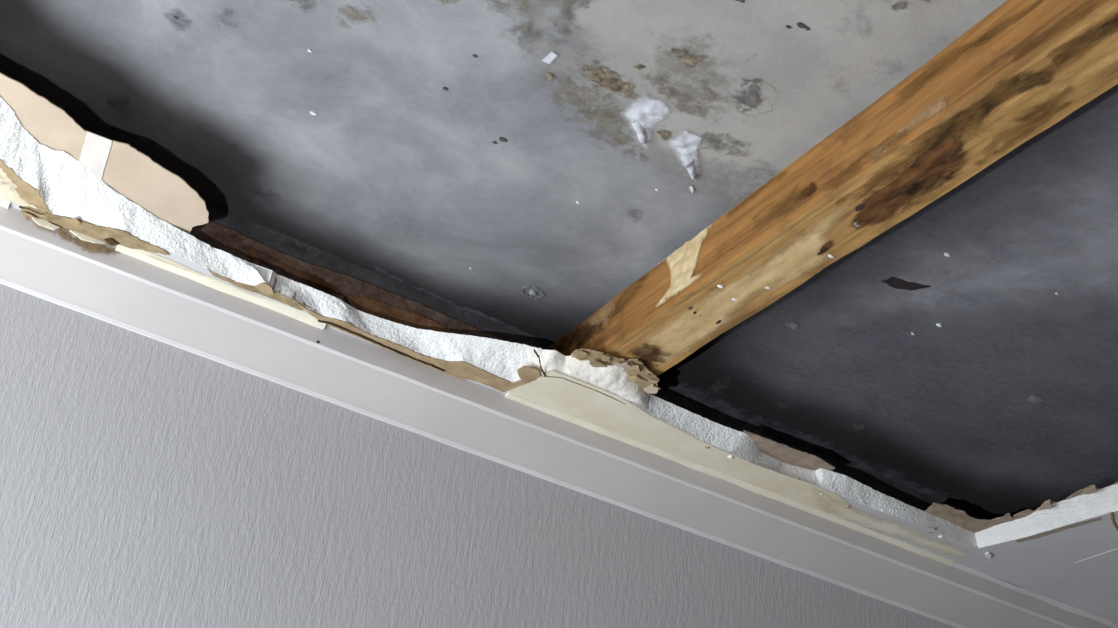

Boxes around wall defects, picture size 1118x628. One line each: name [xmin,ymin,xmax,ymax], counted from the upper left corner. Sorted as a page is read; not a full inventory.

spalling [0,72,543,392]
peeling [0,0,1007,293]
peeling [868,169,1118,312]
spalling [625,394,1015,548]